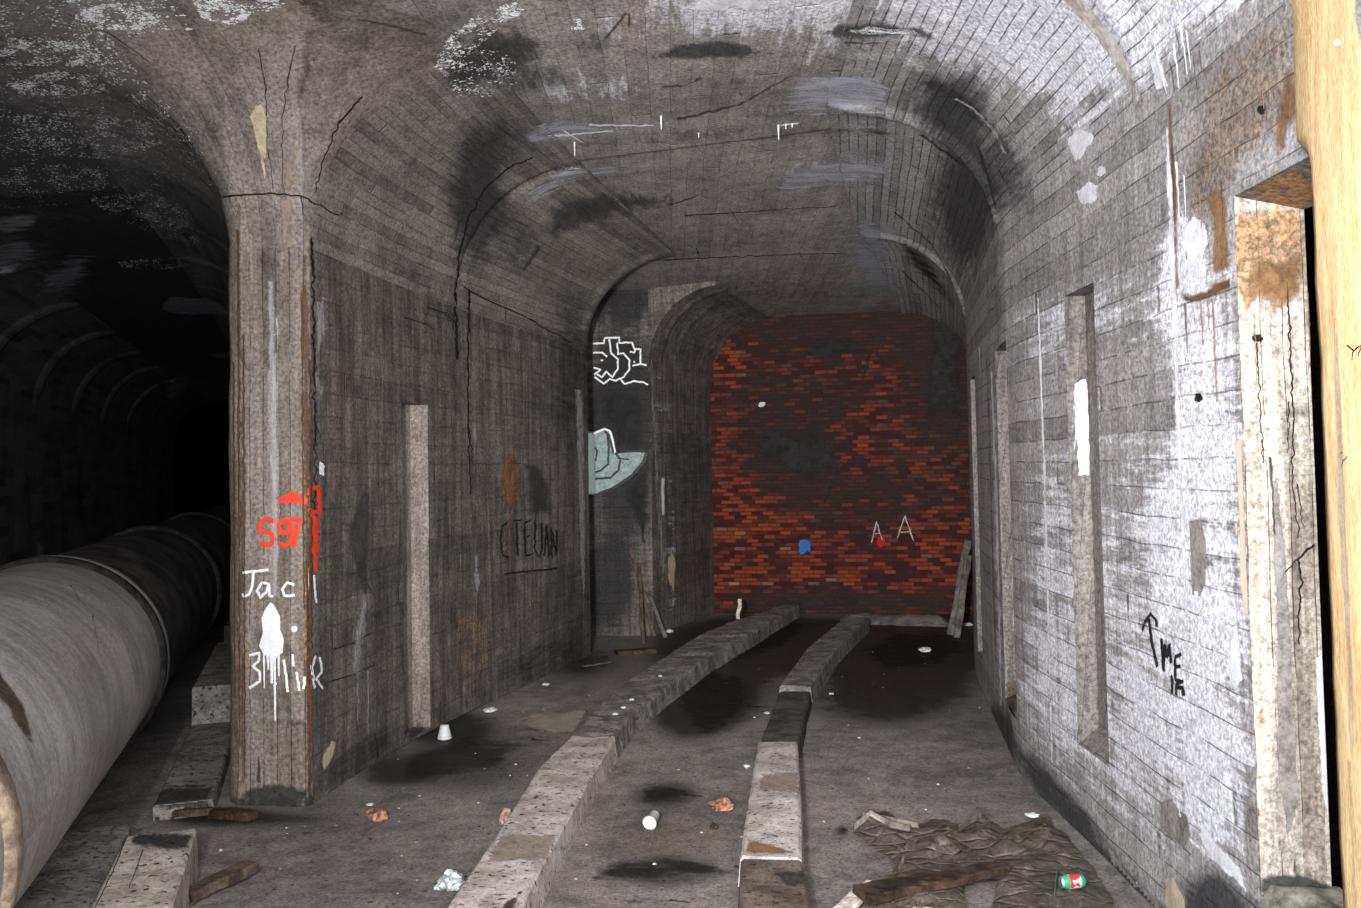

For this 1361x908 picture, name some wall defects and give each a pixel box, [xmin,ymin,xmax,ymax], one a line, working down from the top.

leakage [445,28,538,88]
crack [147,46,363,557]
crack [404,157,572,495]
rust [1168,105,1230,402]
rust [1249,259,1311,366]
rust [232,230,246,779]